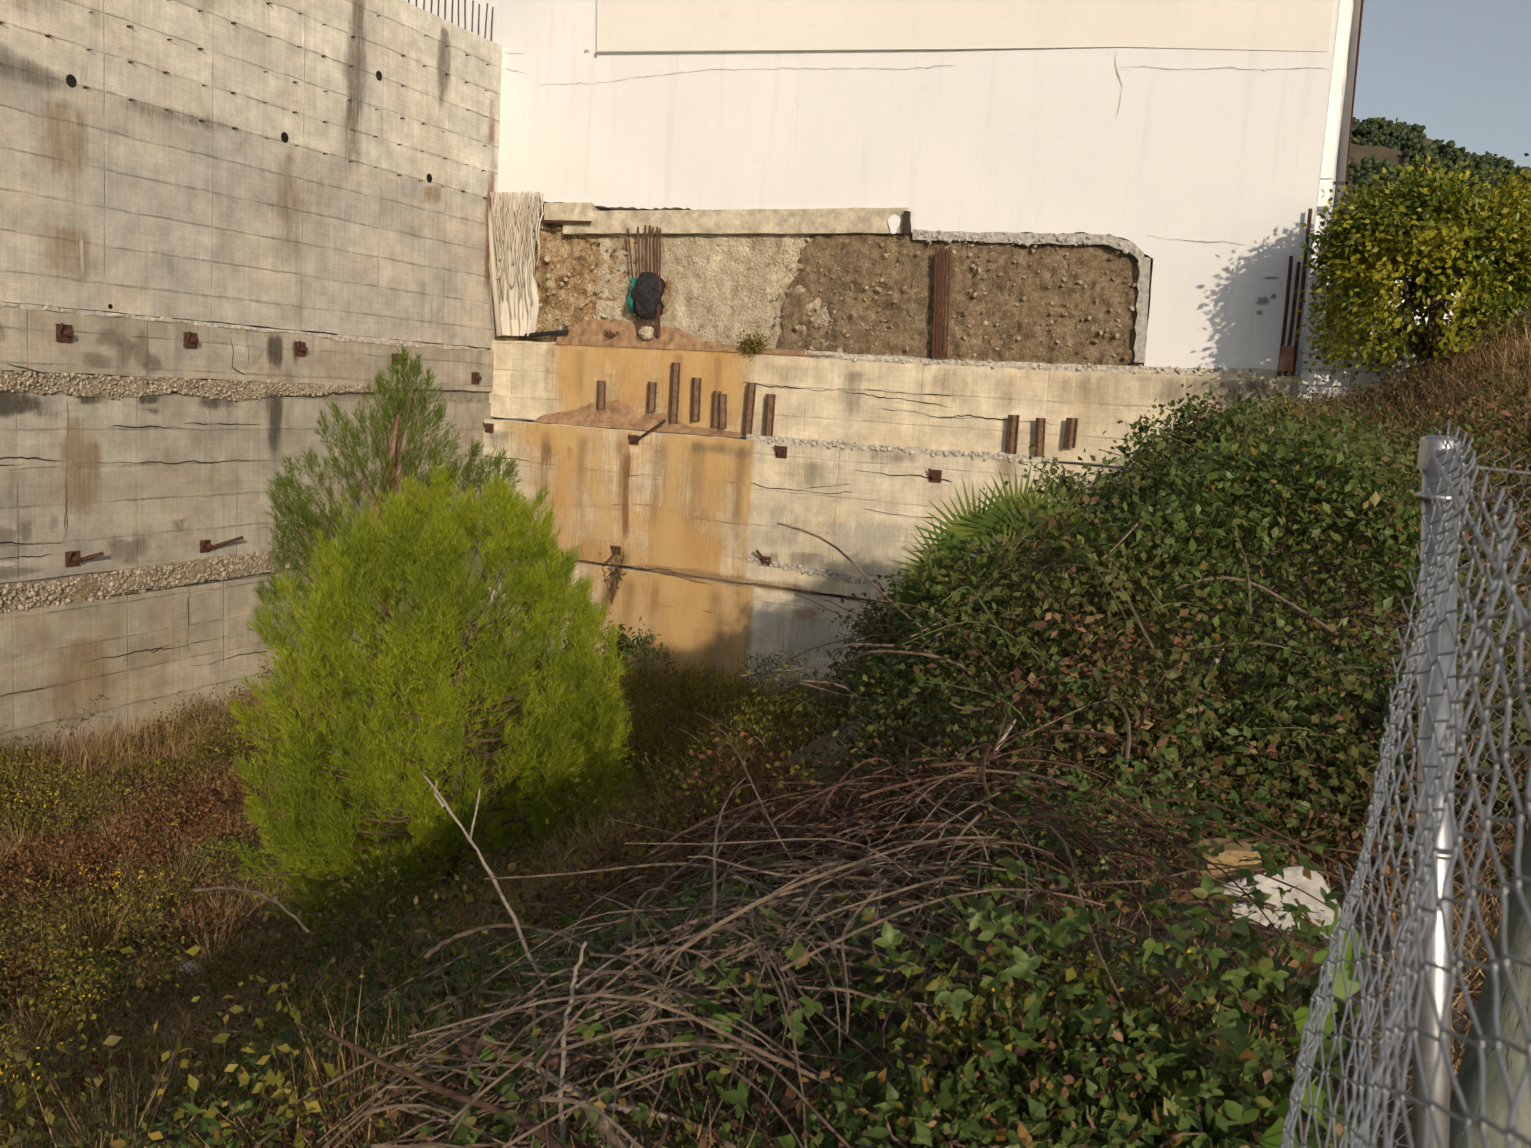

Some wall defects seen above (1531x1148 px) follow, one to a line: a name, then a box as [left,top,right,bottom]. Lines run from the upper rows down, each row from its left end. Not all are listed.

leakage [348,0,365,115]
crack [506,52,953,86]
crack [1115,49,1327,118]
spalling [626,225,666,336]
spalling [805,208,1312,378]
rust [519,344,753,688]